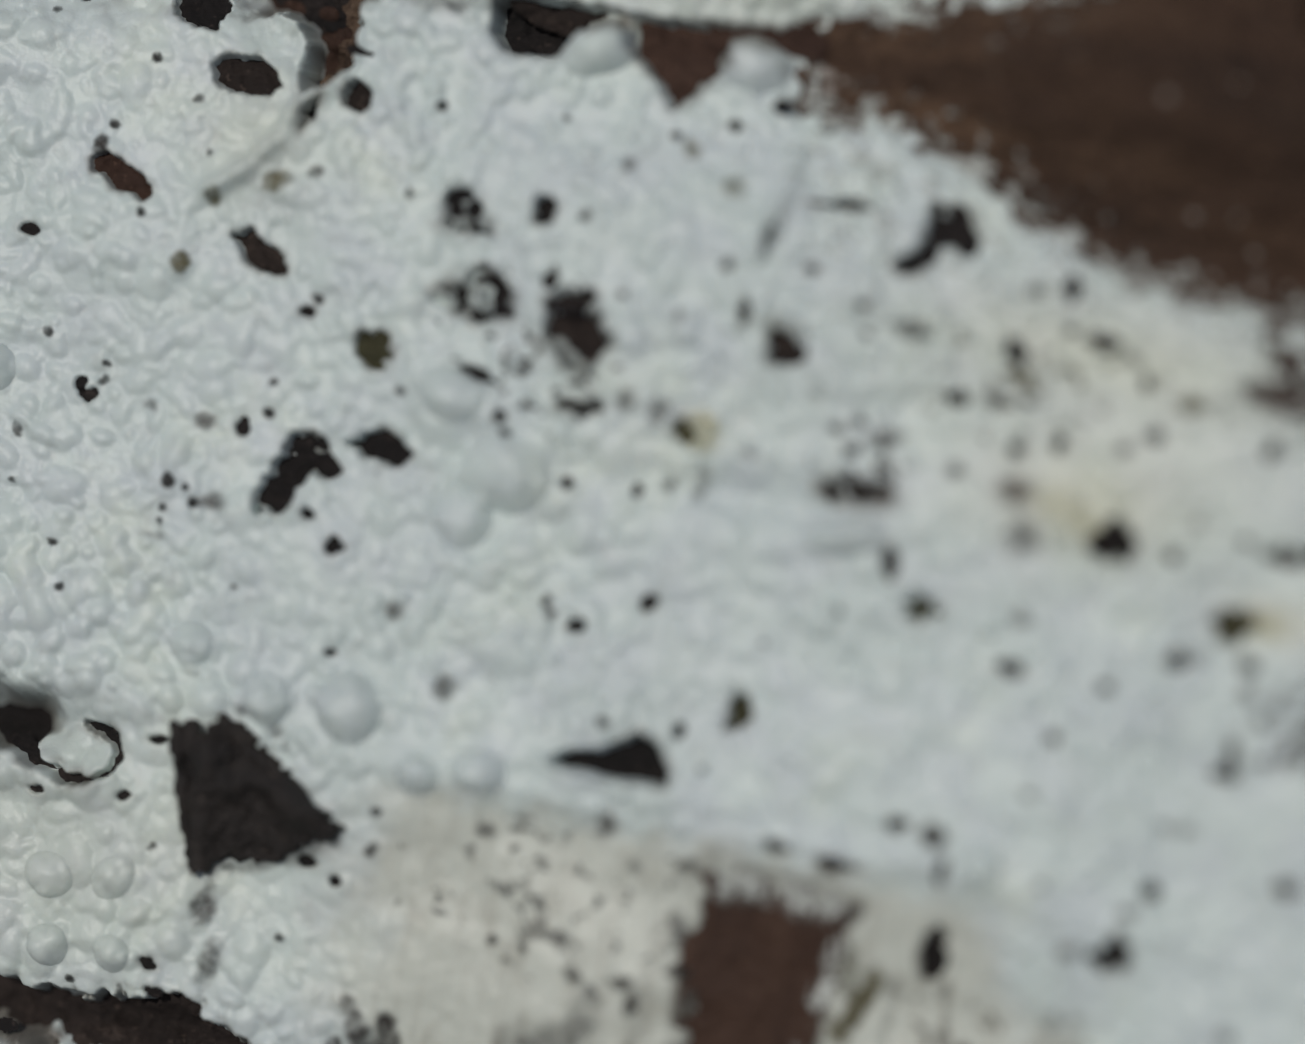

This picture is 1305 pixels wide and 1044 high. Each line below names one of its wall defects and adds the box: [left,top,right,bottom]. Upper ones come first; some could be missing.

peeling [548,292,607,363]
peeling [1248,350,1305,418]
peeling [824,478,892,502]
leakage [495,883,601,995]
peeling [673,870,861,1044]
leakage [334,998,399,1044]
leakage [614,978,636,1015]
leakage [829,947,883,1043]